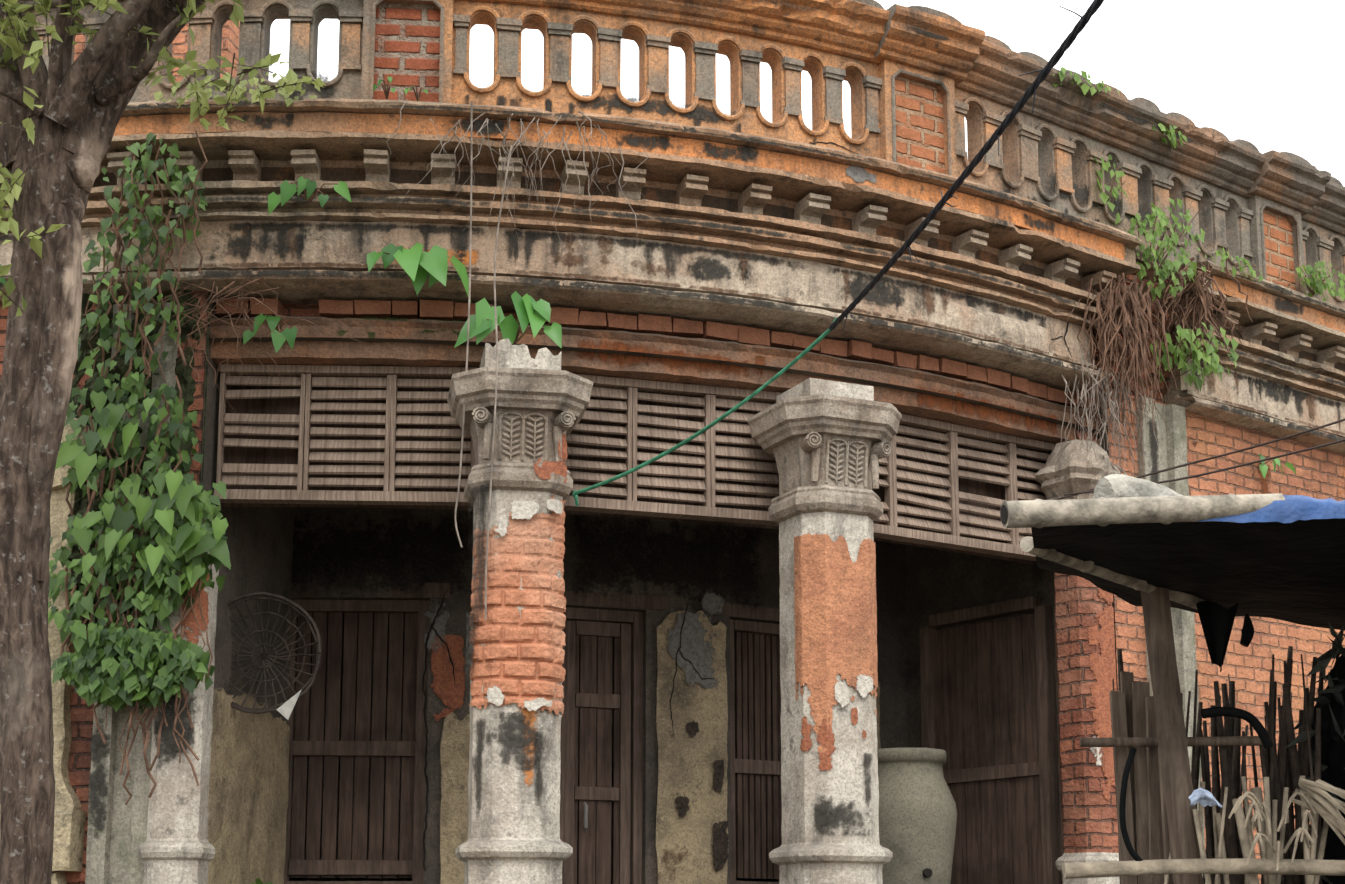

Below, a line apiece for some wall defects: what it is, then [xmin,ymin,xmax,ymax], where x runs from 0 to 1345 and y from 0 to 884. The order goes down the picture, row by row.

water stain [200,222,485,281]
water stain [506,230,802,312]
water stain [516,203,799,238]
flaking render [534,434,568,483]
flaking render [424,495,566,722]
crack [669,603,719,735]
peeling [794,533,878,771]
water stain [472,712,543,810]
water stain [814,753,873,836]